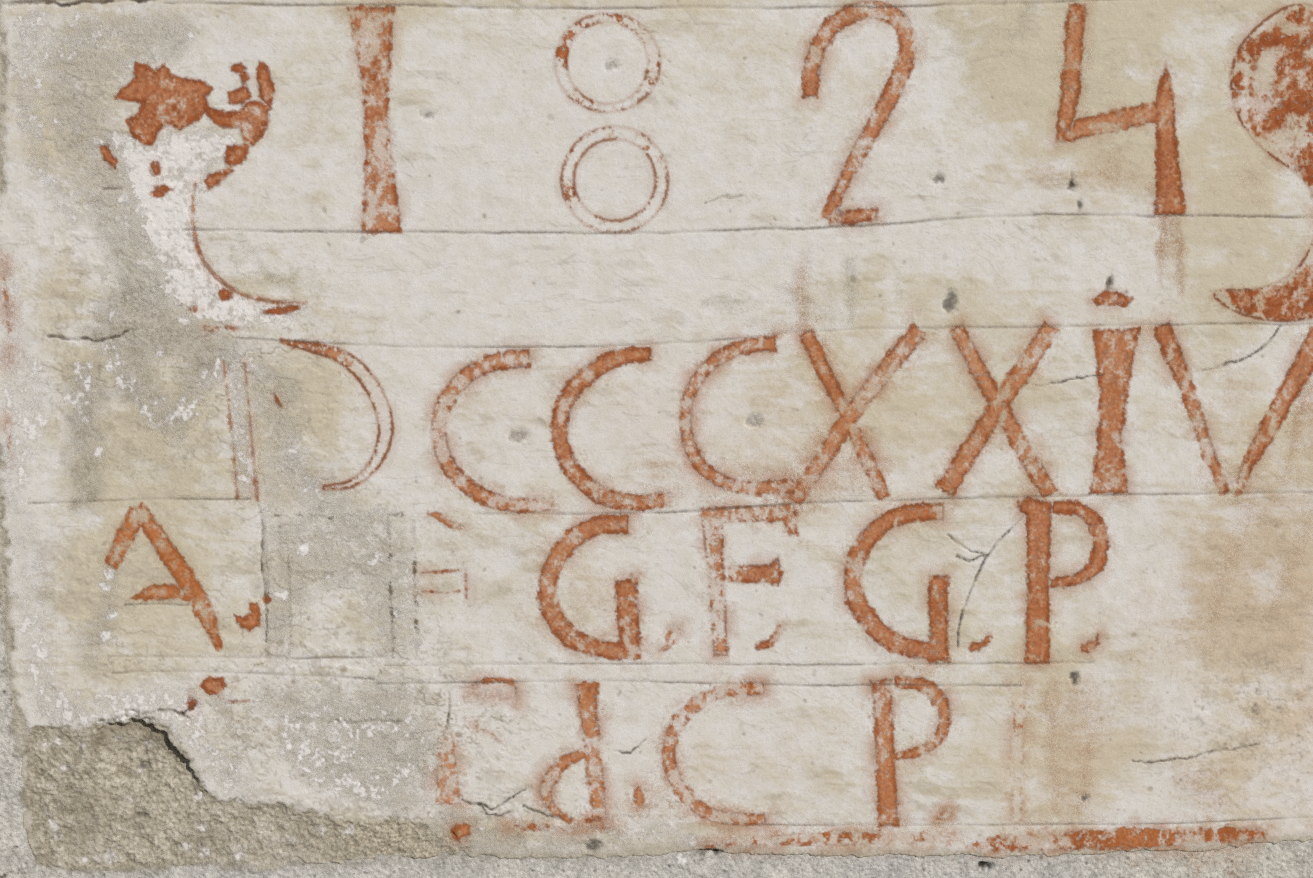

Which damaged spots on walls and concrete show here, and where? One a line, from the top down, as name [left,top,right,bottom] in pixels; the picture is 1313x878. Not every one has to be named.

crack [46,0,148,8]
spalling [0,496,14,651]
spalling [11,692,328,872]
peeling [279,696,437,805]